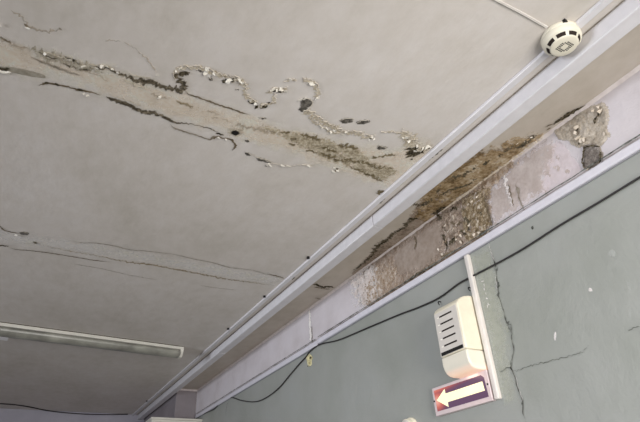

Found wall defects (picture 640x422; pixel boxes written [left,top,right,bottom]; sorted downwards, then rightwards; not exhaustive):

crack [29,46,249,150]
peeling [172,64,387,150]
peeling [245,152,316,167]
water stain [261,126,399,203]
peeling [381,128,433,160]
water stain [490,145,553,224]
flaking render [540,102,611,193]
crack [0,226,282,290]
flaking render [349,161,519,309]
crack [489,246,586,421]